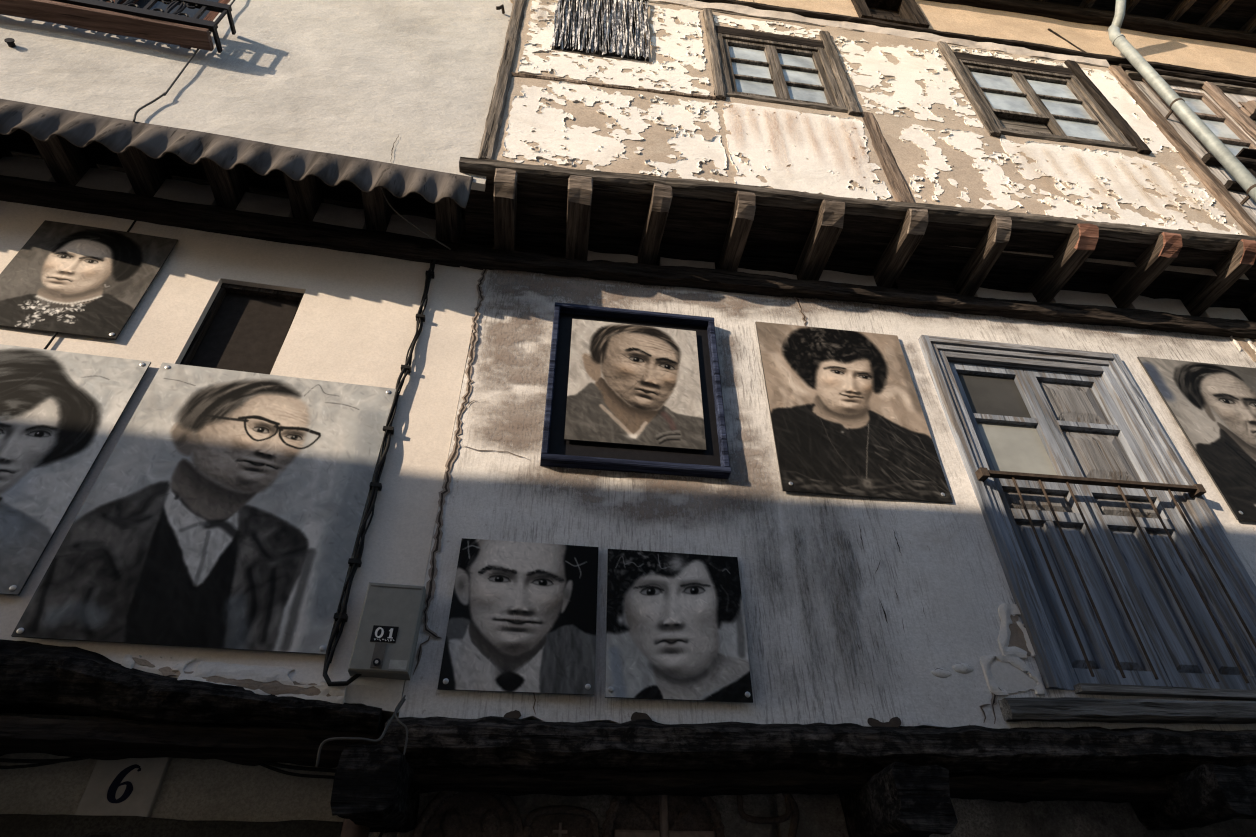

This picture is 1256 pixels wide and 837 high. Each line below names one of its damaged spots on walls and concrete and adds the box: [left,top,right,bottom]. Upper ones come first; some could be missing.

peeling [502,0,1244,235]
crack [413,269,530,675]
flaking render [980,603,1045,697]